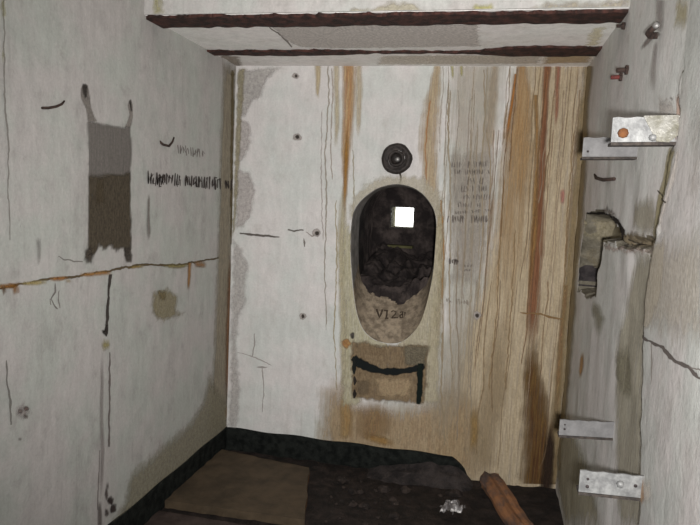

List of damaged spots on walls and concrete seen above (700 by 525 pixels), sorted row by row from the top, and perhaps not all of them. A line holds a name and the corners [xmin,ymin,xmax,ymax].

crack [2,0,10,234]
crack [0,256,219,509]
leakage [98,56,240,525]
peeling [232,69,274,232]
crack [252,334,267,412]
rust [335,66,361,381]
rust [421,66,445,337]
rust [503,66,560,329]
rust [524,353,554,488]
rust [556,285,567,397]
crack [643,333,700,382]